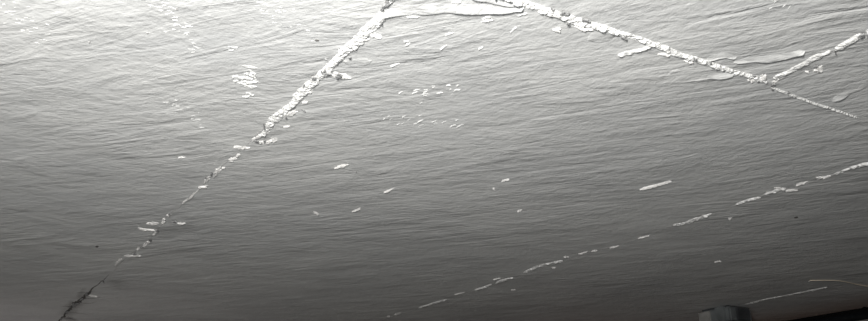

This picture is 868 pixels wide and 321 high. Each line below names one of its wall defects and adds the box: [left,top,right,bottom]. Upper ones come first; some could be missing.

crack [492,0,868,122]
crack [58,0,421,321]
crack [382,162,868,321]